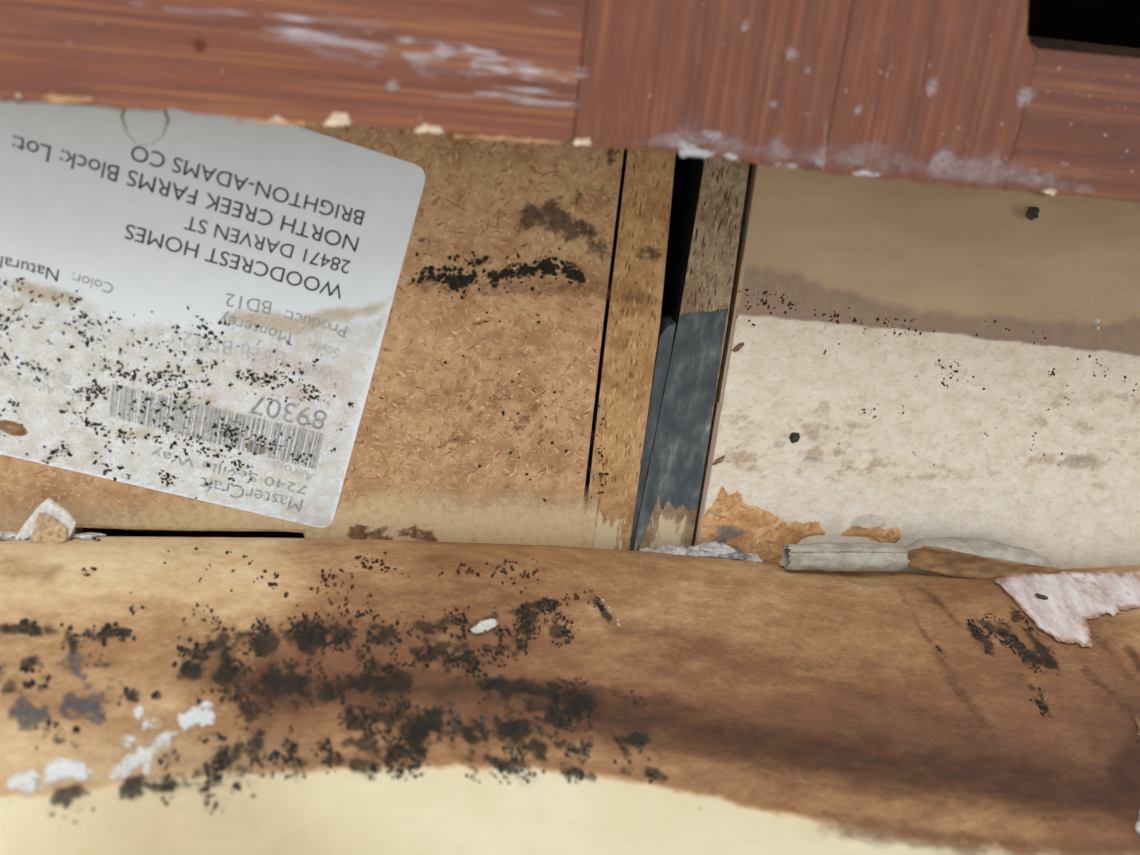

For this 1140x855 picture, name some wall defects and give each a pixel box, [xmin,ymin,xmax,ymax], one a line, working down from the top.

water stain [408,202,605,299]
water stain [0,254,1140,855]
peeling [697,486,825,564]
peeling [841,516,1140,648]